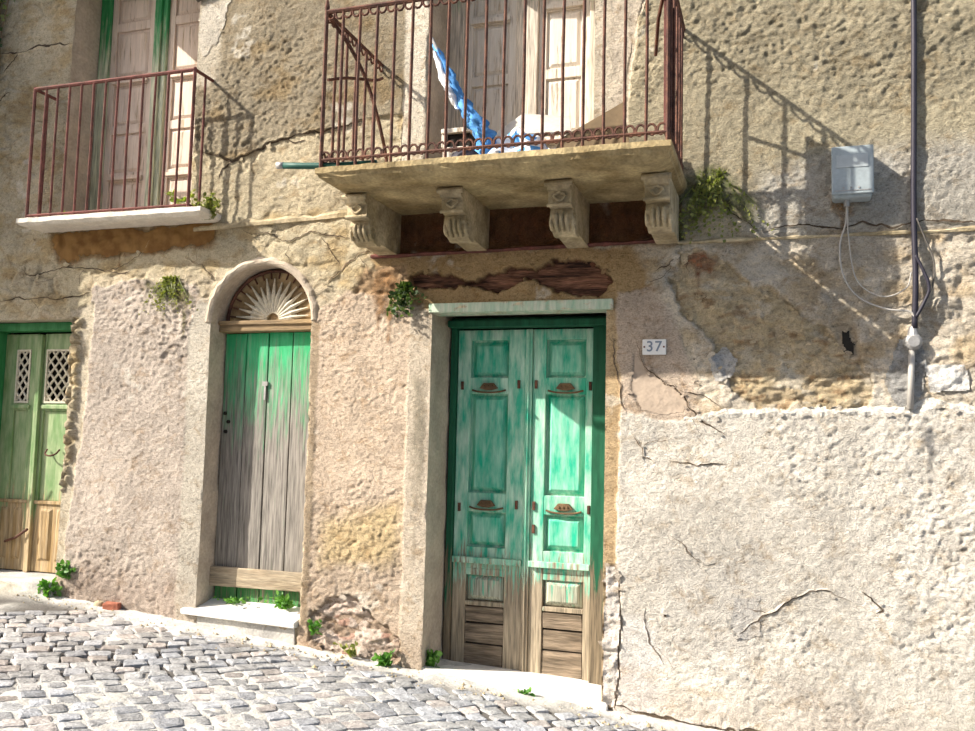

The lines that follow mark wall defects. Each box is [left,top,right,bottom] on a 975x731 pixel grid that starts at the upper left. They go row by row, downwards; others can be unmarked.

crack [197,118,362,178]
flaking render [626,247,975,421]
crack [609,333,728,467]
flaking render [304,595,403,661]
crack [740,588,889,634]